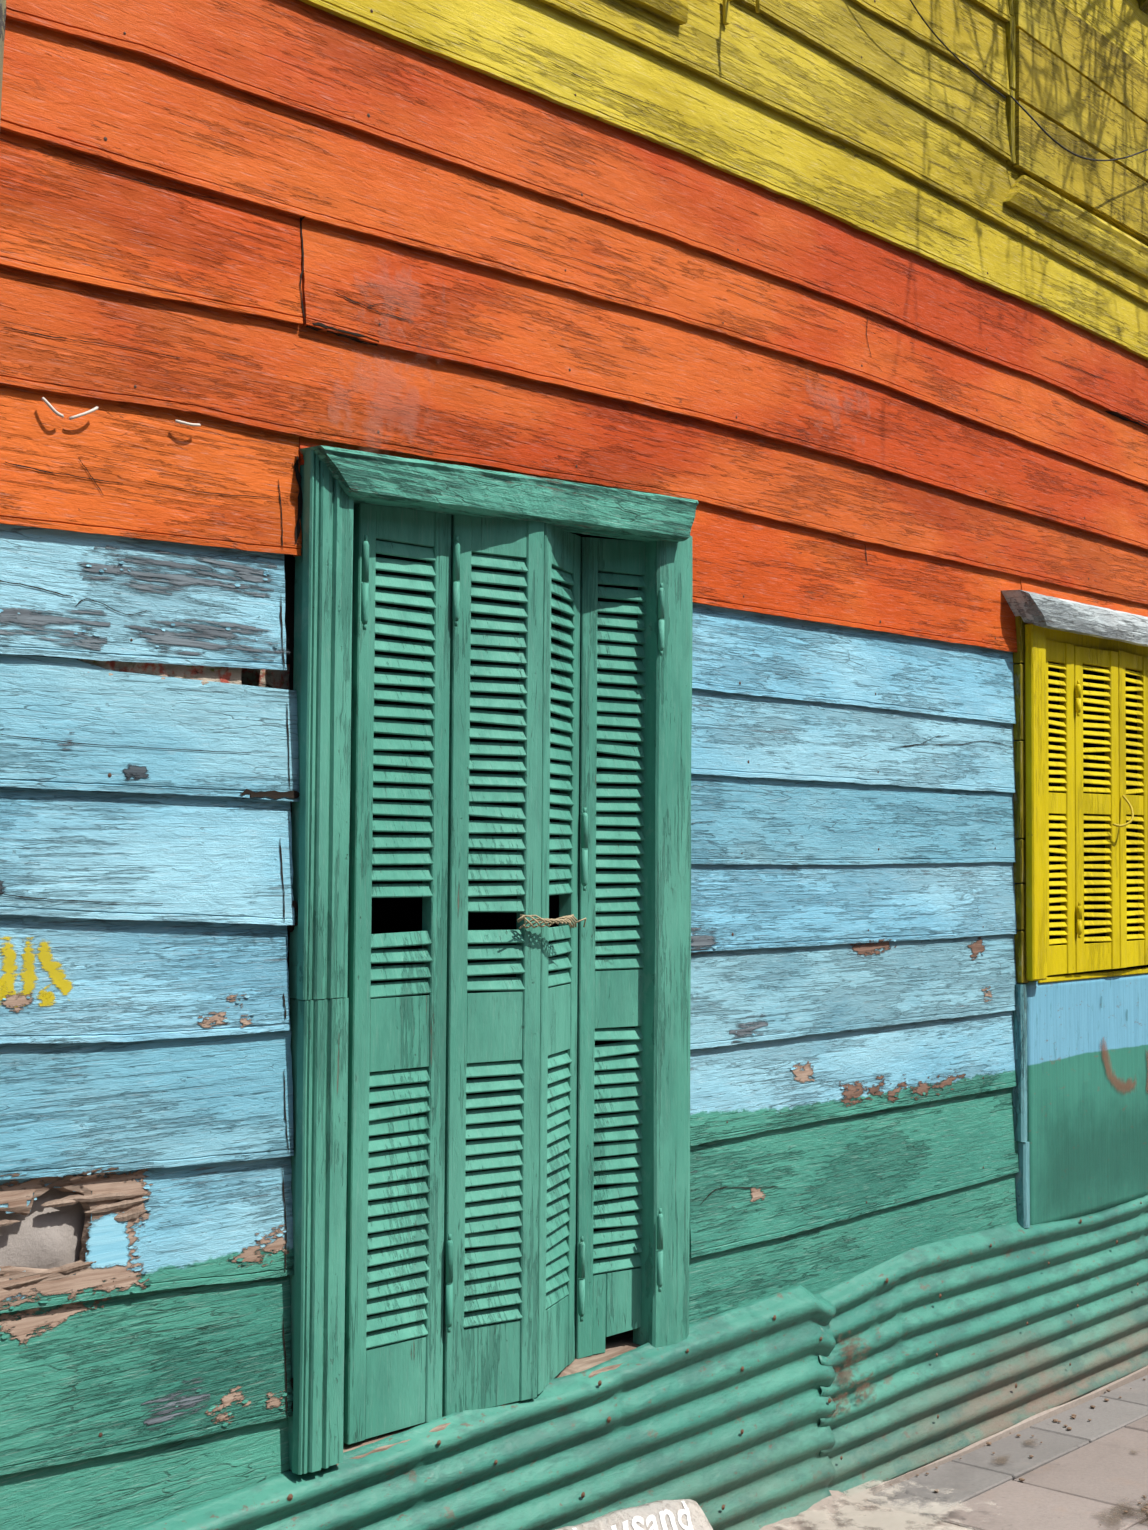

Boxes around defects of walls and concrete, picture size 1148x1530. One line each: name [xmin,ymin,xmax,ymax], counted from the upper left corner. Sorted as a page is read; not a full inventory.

peeling [77,546,277,597]
peeling [0,599,290,690]
peeling [197,992,255,1029]
peeling [839,1068,966,1107]
peeling [0,1167,153,1348]
peeling [229,1224,289,1268]
peeling [141,1377,288,1430]